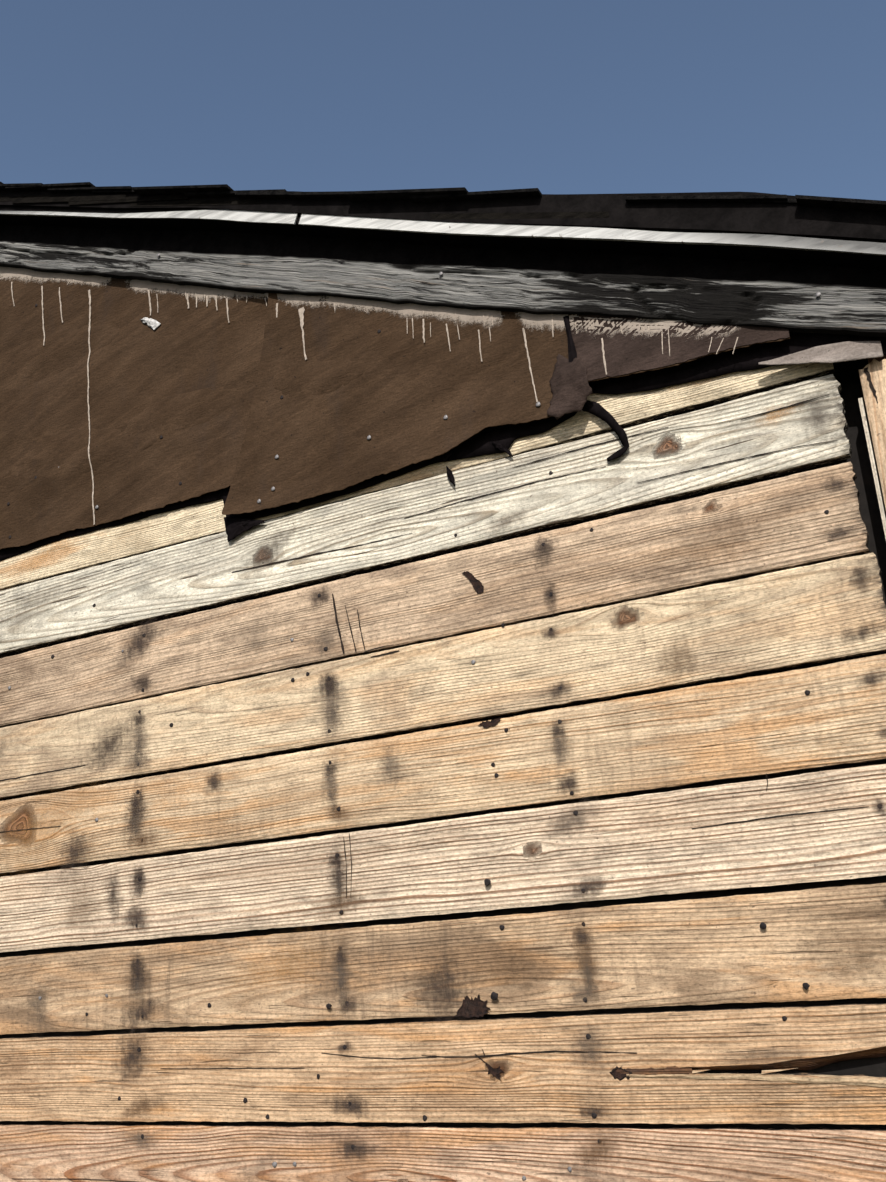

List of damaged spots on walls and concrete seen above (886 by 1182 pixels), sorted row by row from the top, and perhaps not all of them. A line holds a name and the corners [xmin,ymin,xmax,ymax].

spalling [462,571,484,594]
damp [95,732,121,758]